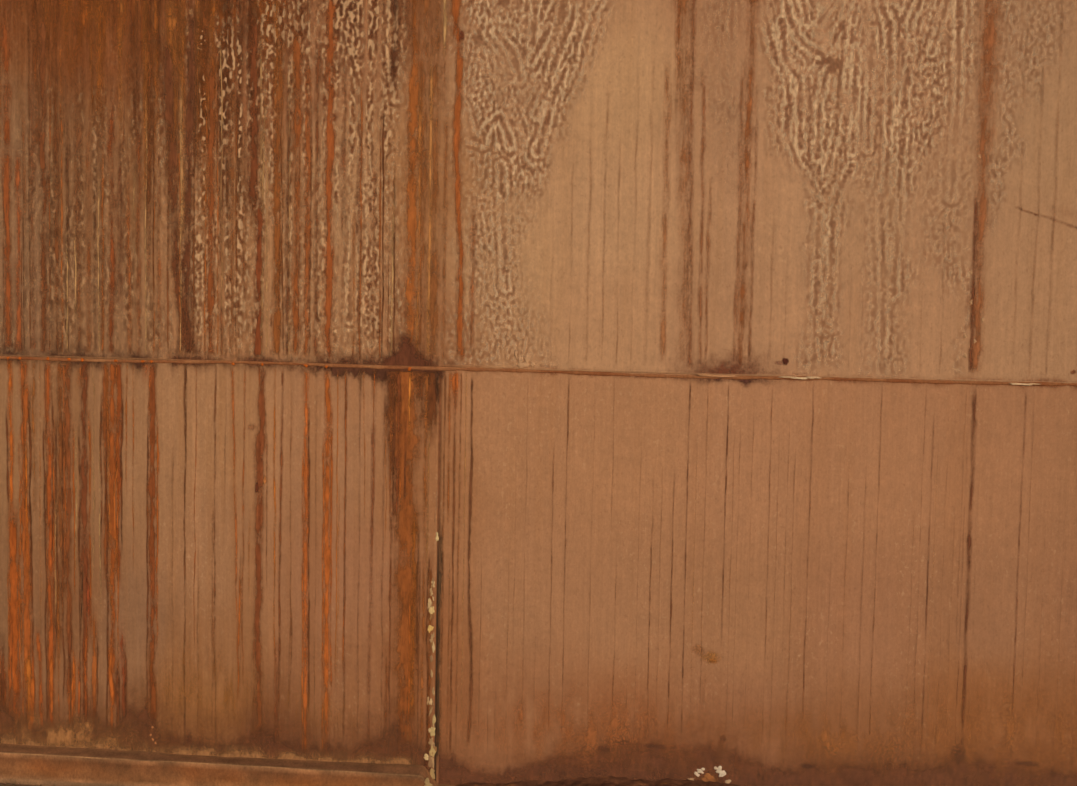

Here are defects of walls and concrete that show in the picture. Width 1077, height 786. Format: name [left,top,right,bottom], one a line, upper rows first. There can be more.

corrosion [964,0,998,369]
corrosion [0,0,475,754]
leakage [0,536,1077,786]